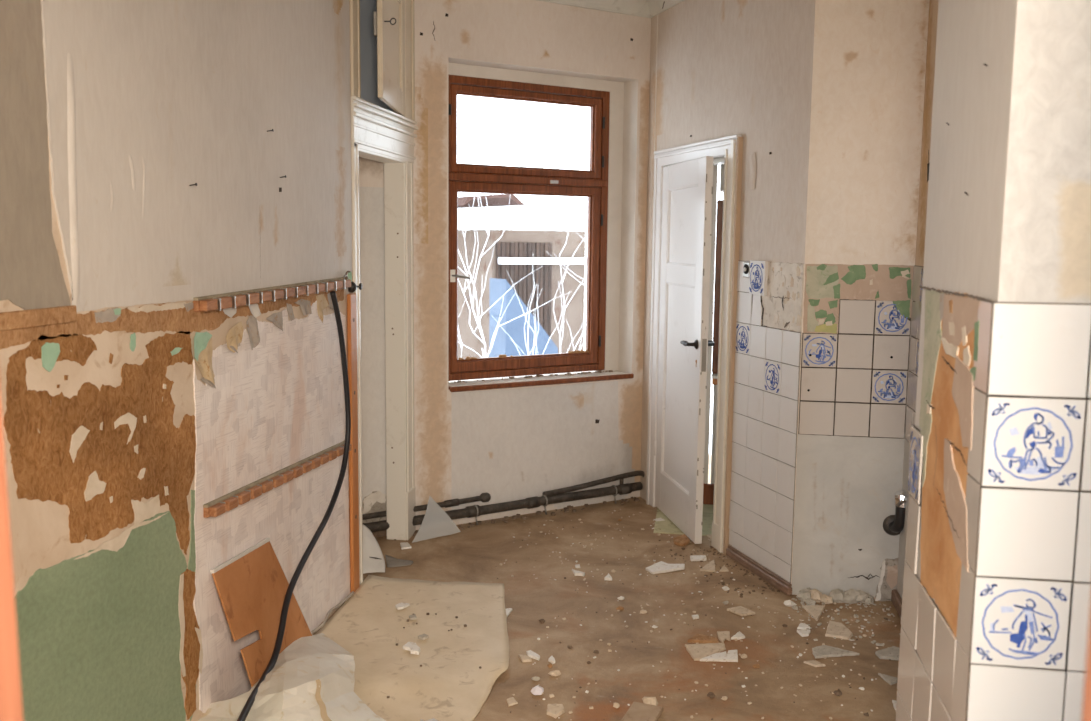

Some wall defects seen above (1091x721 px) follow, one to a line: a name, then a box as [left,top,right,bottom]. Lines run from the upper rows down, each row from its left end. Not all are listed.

peeling [0,289,344,560]
peeling [178,569,203,720]